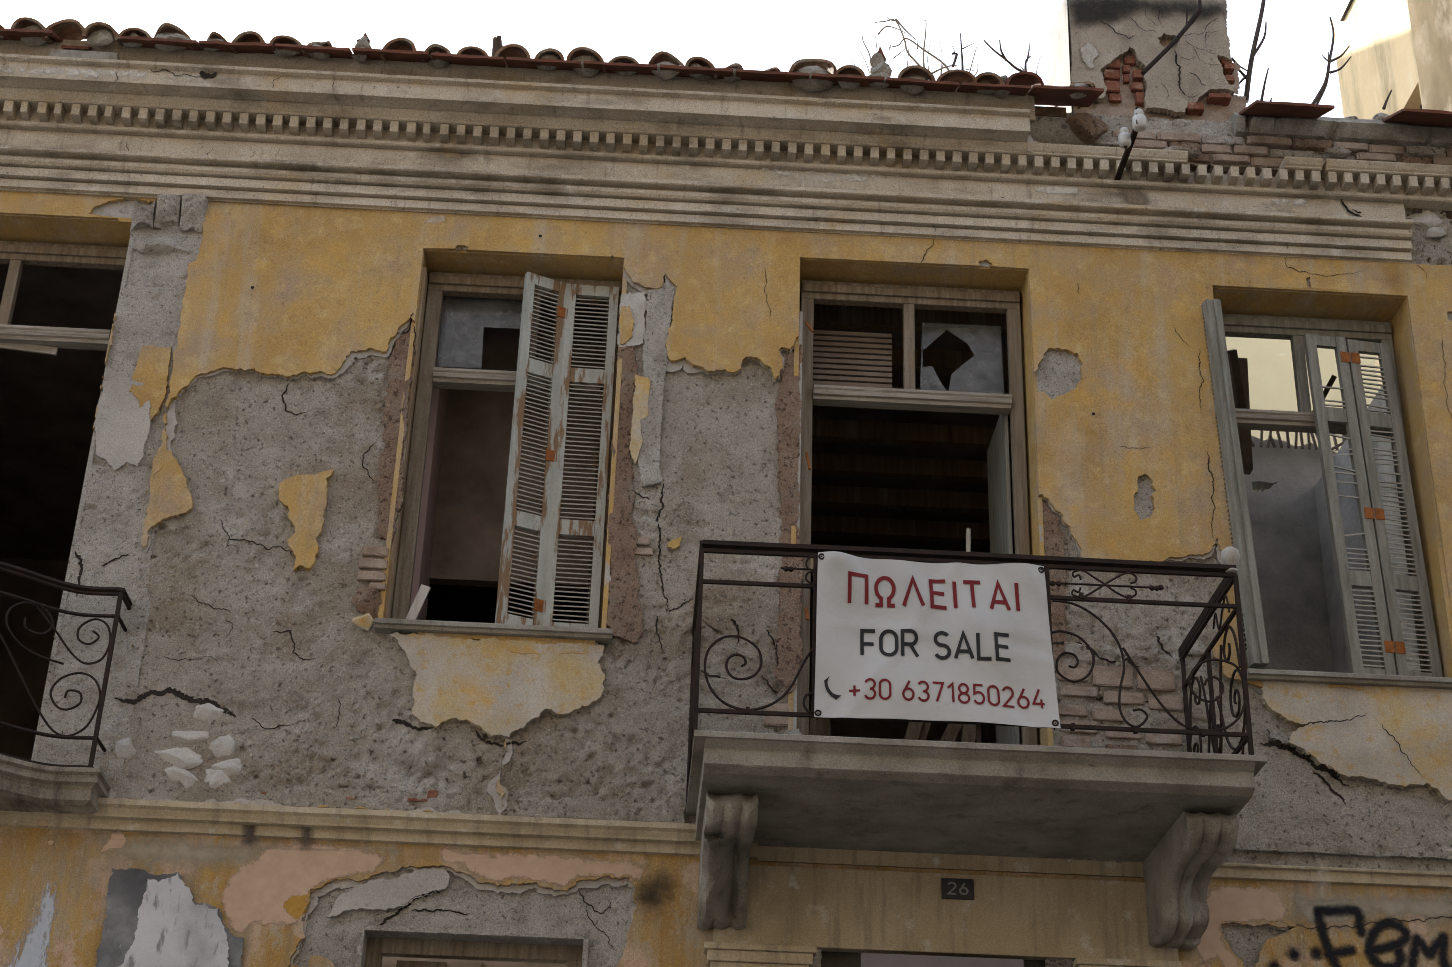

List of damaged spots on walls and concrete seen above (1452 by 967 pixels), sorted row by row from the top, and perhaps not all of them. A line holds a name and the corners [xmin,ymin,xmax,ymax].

spalling [1081,42,1452,176]
spalling [1405,209,1452,266]
spalling [1037,350,1081,399]
spalling [35,200,804,824]
spalling [1134,476,1154,520]
spalling [1042,502,1452,967]
spalling [222,844,645,967]